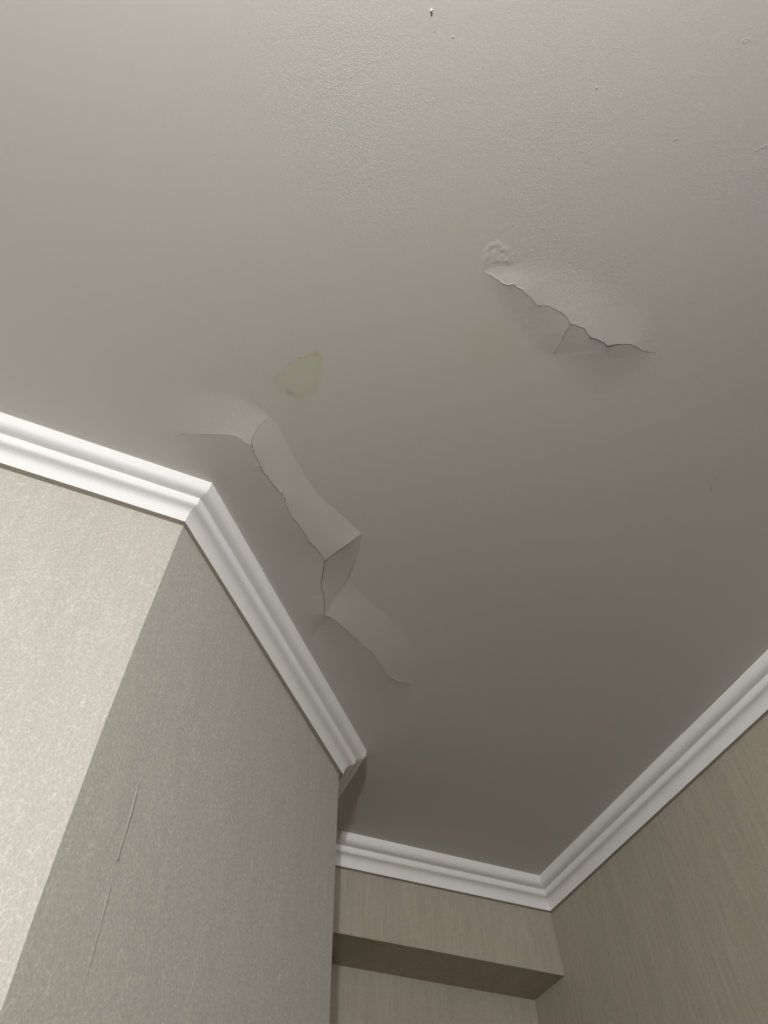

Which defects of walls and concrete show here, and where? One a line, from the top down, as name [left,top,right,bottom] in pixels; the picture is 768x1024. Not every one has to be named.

peeling [160,388,420,739]